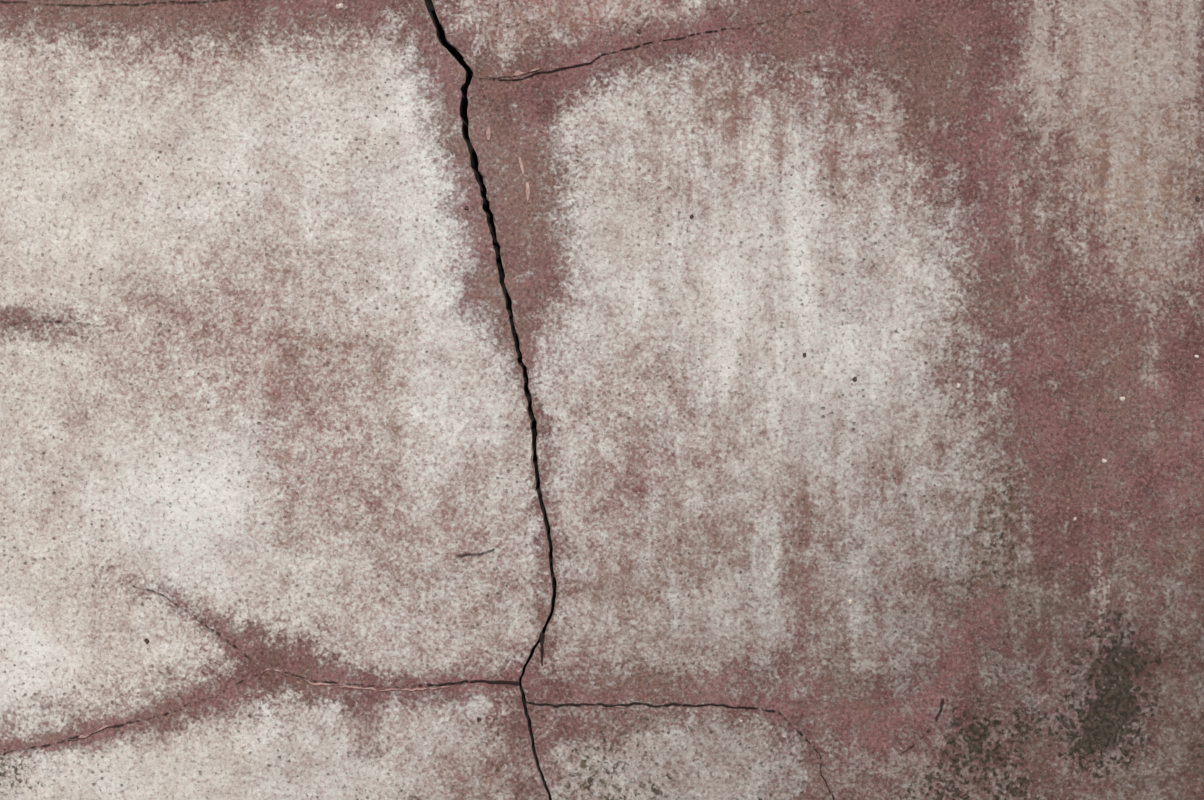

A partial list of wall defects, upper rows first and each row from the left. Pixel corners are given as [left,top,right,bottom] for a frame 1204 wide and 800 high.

crack [0,0,834,800]
leakage [0,522,1162,800]
leakage [0,0,1204,629]